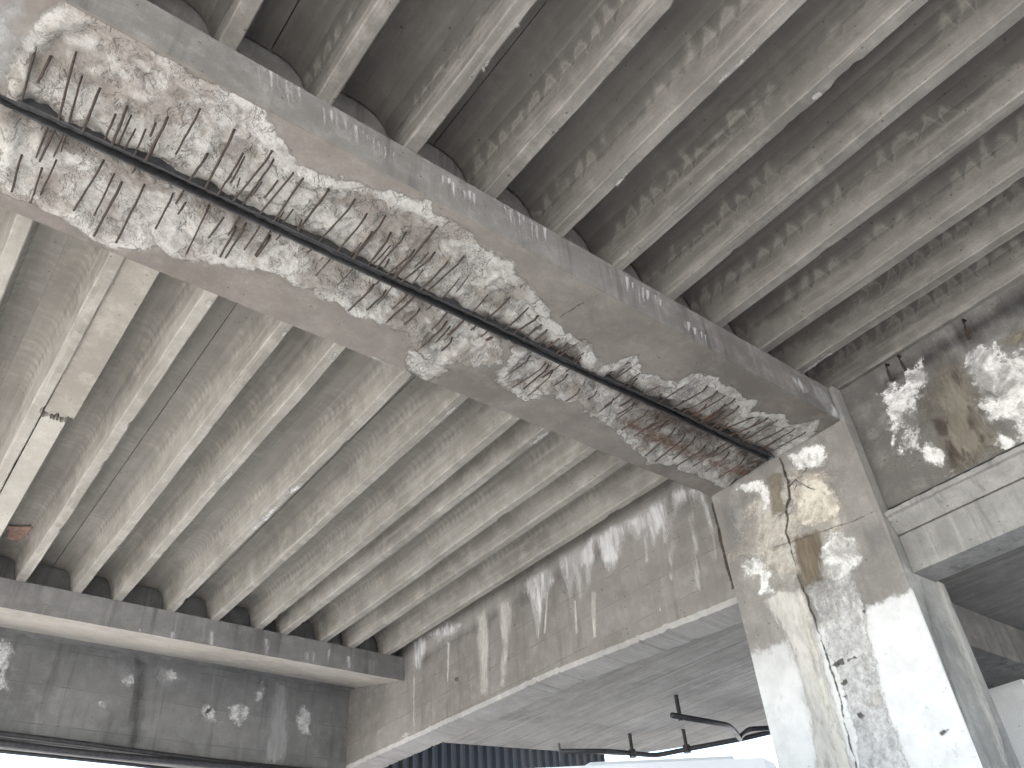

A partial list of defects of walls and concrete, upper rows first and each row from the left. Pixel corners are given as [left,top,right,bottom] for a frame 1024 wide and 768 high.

spalling [0,2,820,489]
damp [880,294,1024,471]
efflorescence [565,489,703,575]
crack [712,502,734,590]
damp [727,444,882,595]
efflorescence [0,640,12,689]
damp [228,682,264,726]
damp [267,682,311,763]
efflorescence [414,624,460,677]
efflorescence [479,613,488,683]
efflorescence [528,573,554,633]
crack [777,458,872,768]